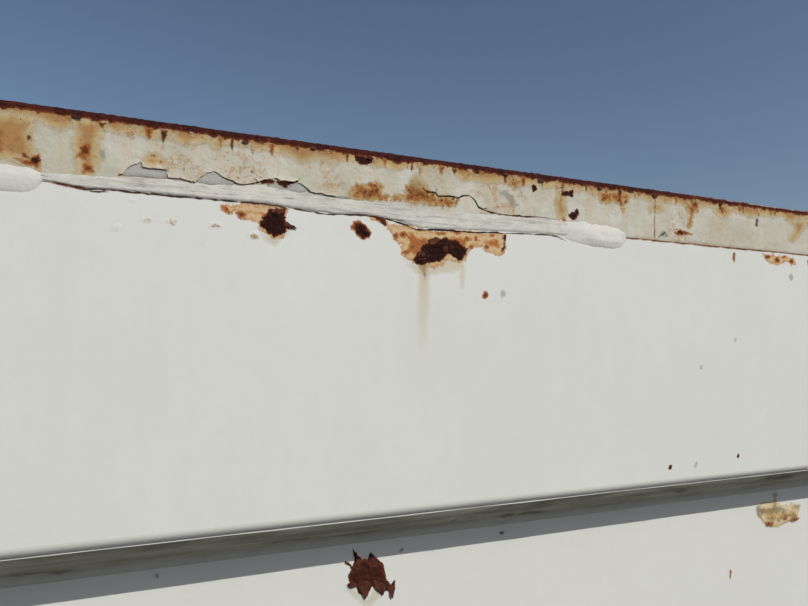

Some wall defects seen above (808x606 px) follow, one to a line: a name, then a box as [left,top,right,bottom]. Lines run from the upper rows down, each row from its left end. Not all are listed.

peeling [119,158,351,199]
crack [58,183,566,241]
rust [0,100,808,266]
rust [350,215,507,276]